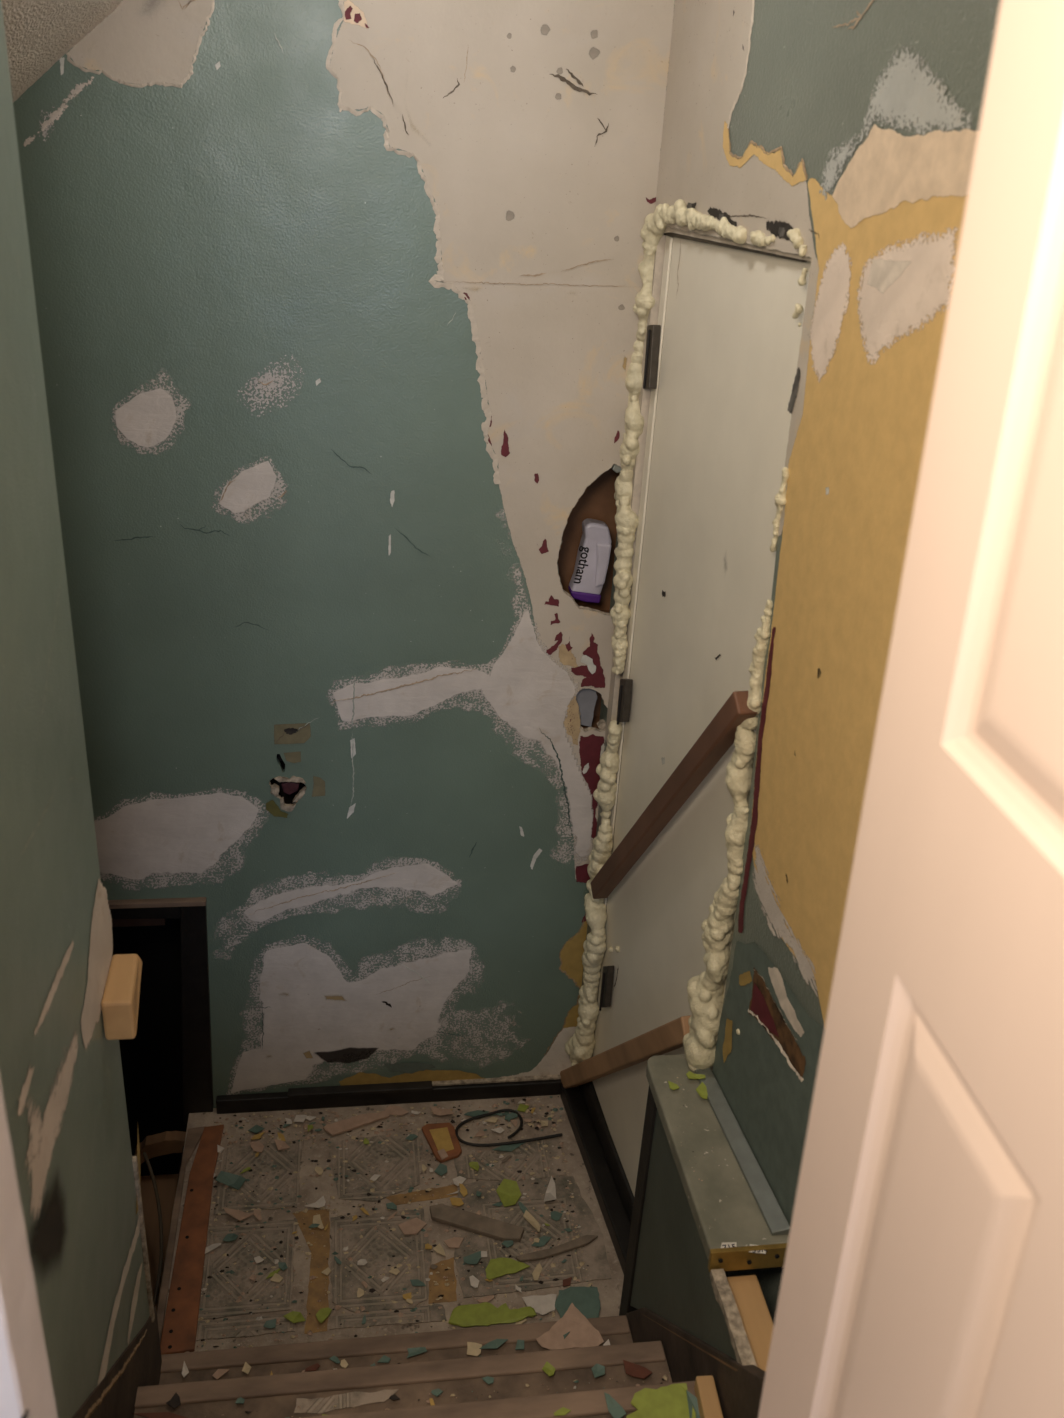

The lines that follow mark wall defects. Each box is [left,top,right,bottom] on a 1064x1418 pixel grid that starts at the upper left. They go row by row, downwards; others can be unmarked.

peeling [66,0,215,88]
peeling [326,0,968,1028]
spalling [269,754,307,812]